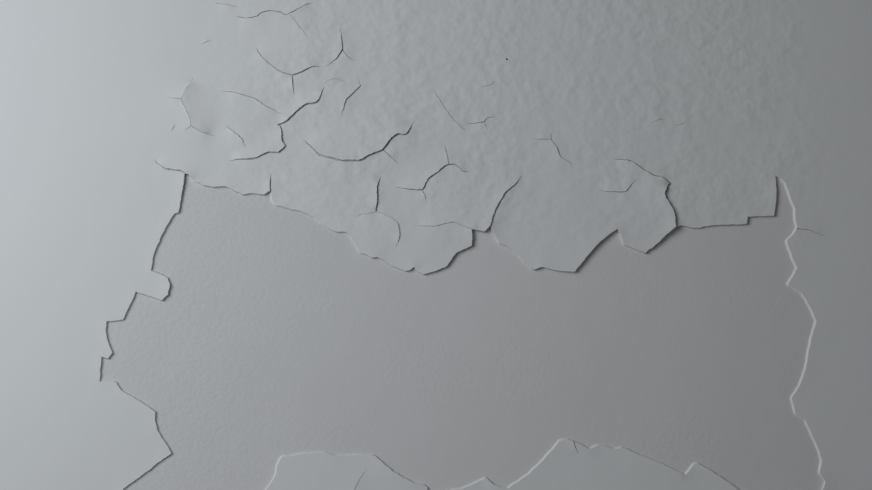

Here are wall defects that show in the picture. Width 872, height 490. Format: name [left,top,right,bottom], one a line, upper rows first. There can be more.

crack [216,3,310,38]
crack [170,33,415,163]
crack [434,91,490,131]
crack [357,147,522,246]
crack [605,159,677,226]
peeling [99,158,826,490]